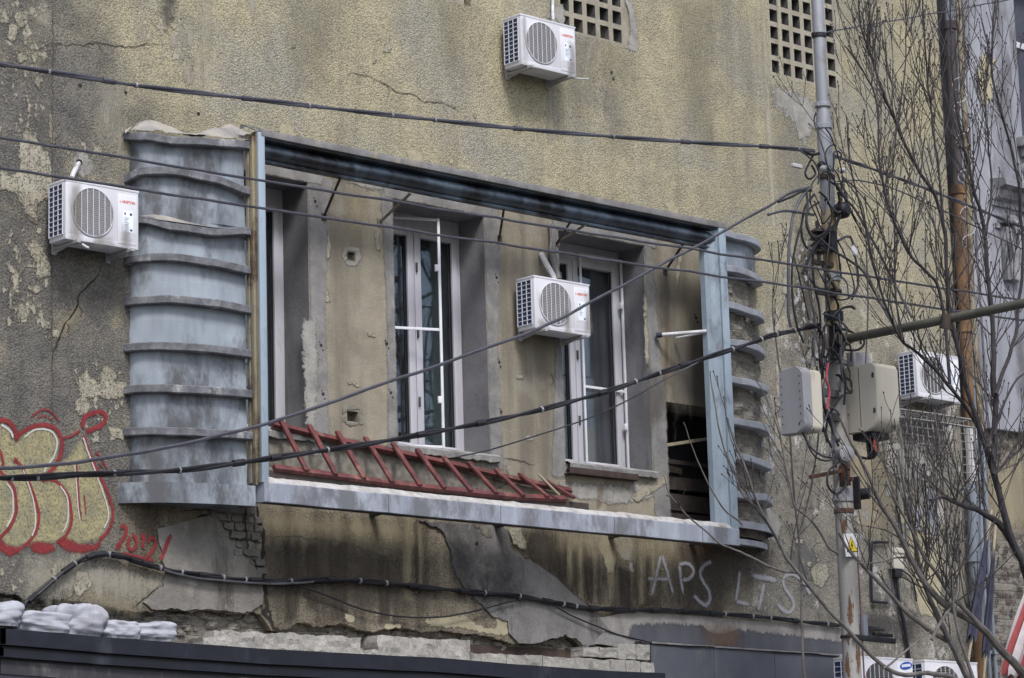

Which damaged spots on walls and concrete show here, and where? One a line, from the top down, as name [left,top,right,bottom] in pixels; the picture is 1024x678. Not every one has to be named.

crack [30,0,158,183]
crack [348,72,459,111]
peeling [0,0,109,338]
corrosion [951,184,971,324]
crack [51,255,102,441]
peeling [68,360,129,443]
spalling [209,506,267,575]
flaking render [0,557,574,655]
water stain [264,511,426,620]
peeling [506,527,527,550]
water stain [526,530,769,608]
corrosion [845,591,860,678]